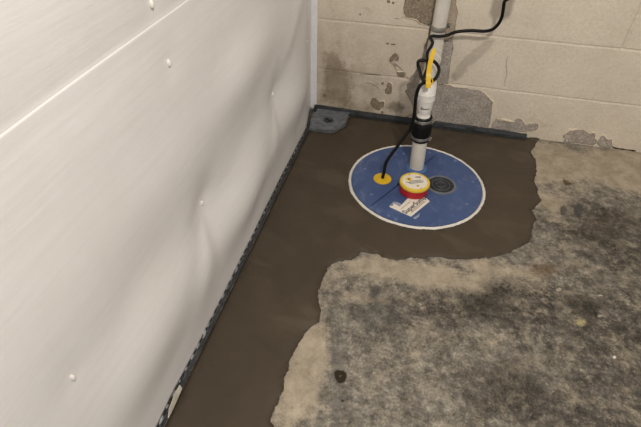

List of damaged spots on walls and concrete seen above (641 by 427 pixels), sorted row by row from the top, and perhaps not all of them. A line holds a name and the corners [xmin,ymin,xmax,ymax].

spalling [389,0,436,118]
spalling [430,0,538,134]
spalling [370,82,393,114]
spalling [563,128,635,151]
damp [335,370,347,383]